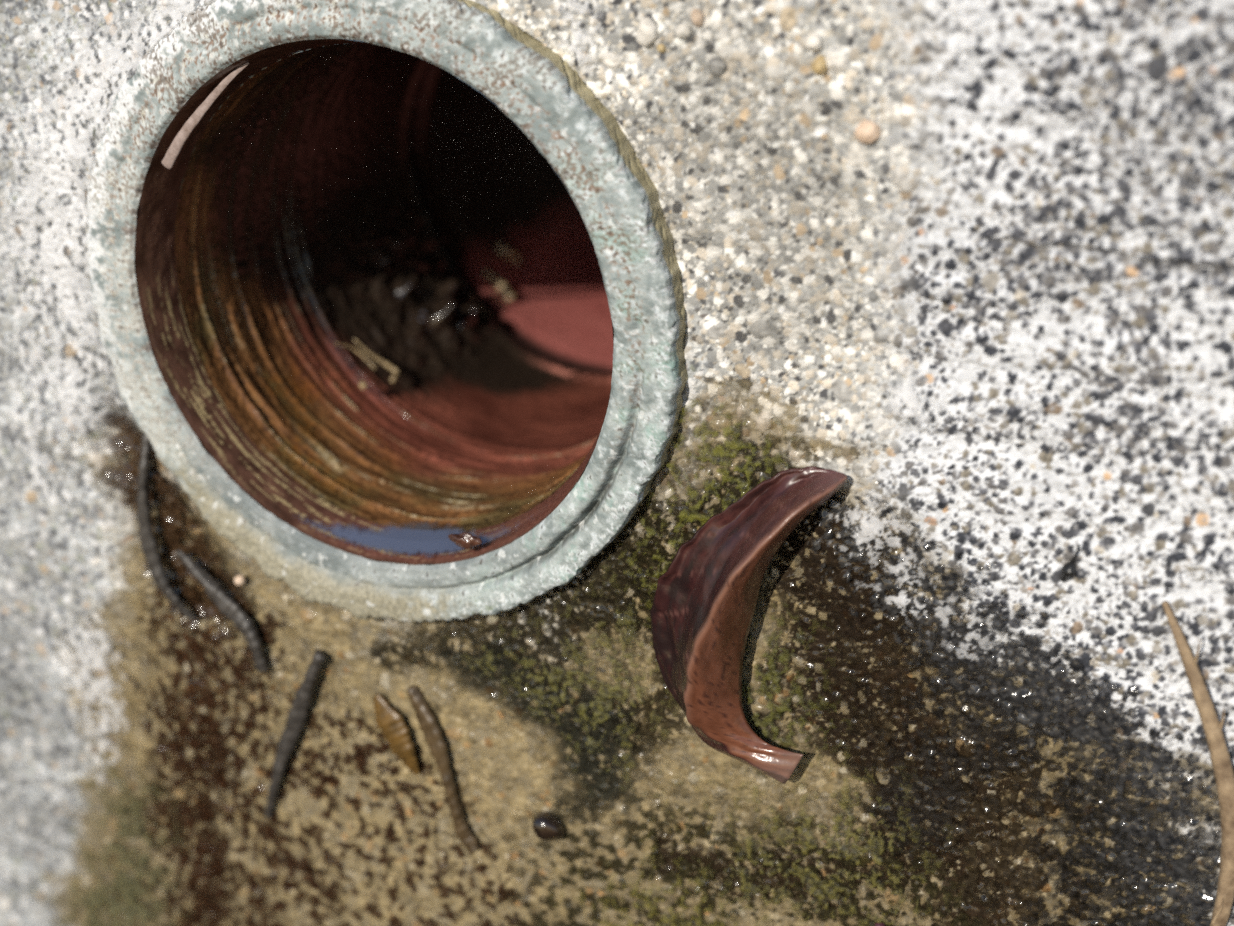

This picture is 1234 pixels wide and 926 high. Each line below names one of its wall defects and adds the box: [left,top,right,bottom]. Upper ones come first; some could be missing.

leakage [43,379,1221,926]